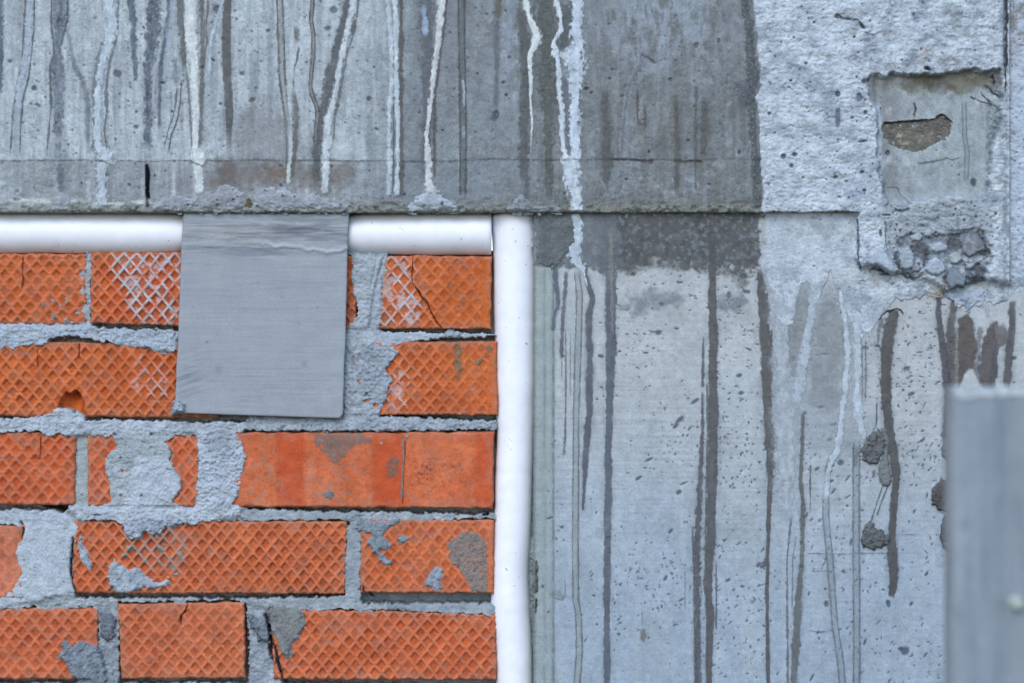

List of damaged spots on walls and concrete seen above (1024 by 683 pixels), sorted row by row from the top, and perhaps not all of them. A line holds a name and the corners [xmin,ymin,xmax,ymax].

water stain [10,0,35,150]
water stain [52,192,70,209]
water stain [47,0,80,149]
water stain [85,0,359,206]
efflorescence [385,0,404,196]
water stain [419,0,467,193]
spalling [881,116,951,152]
crack [412,261,441,327]
water stain [494,0,901,683]
water stain [935,298,1015,388]